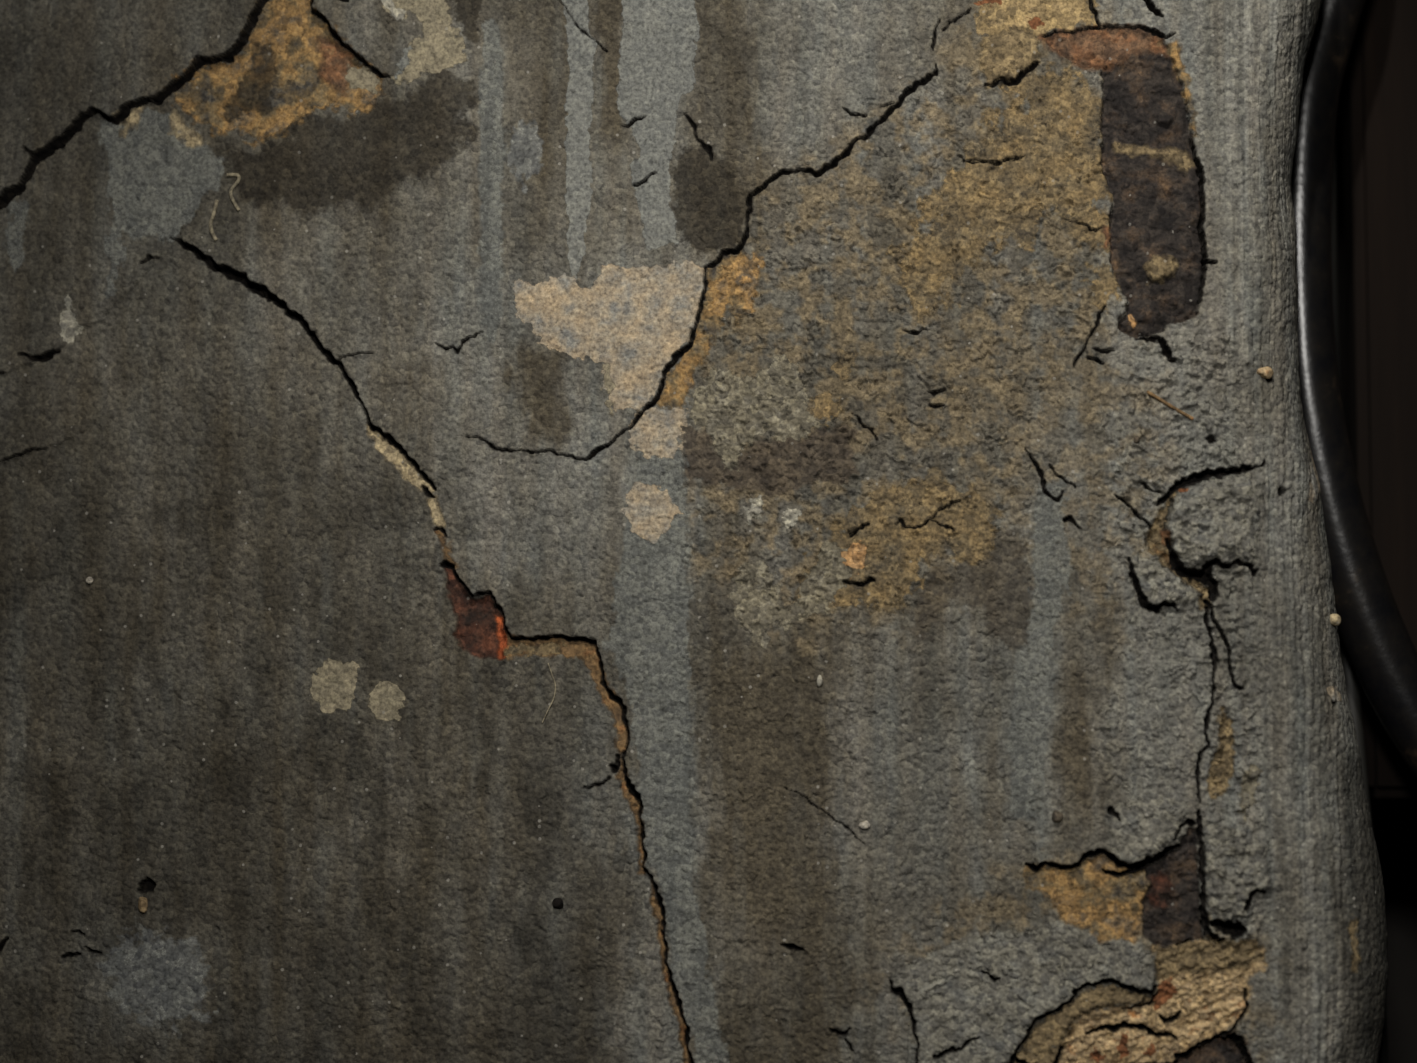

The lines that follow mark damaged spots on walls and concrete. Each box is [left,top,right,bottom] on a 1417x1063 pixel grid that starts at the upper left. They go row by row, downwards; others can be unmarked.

crack [0,0,268,209]
spalling [175,0,382,146]
crack [467,9,971,461]
spalling [1039,24,1205,339]
crack [1073,306,1176,366]
crack [1189,138,1217,304]
damp [381,0,858,1063]
damp [310,658,406,721]
crack [141,238,694,1063]
crack [1025,449,1266,946]
spalling [891,828,1267,1063]
crack [1009,978,1253,1063]